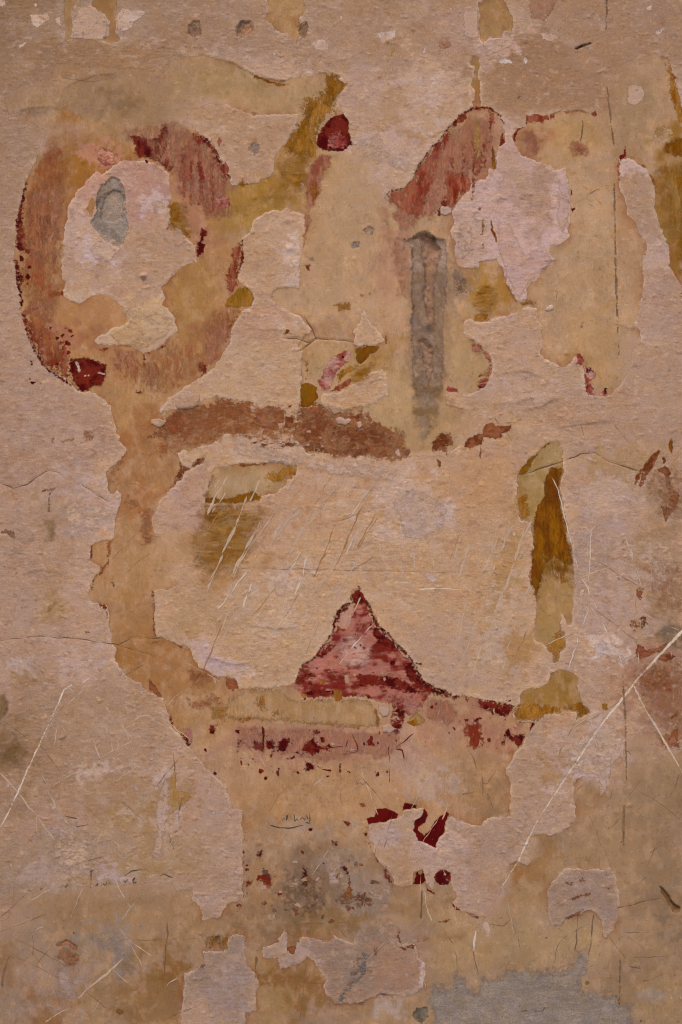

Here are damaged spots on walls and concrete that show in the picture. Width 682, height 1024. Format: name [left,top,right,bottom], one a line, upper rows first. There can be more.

spalling [87,177,128,262]
crack [286,320,349,351]
peeling [204,462,297,503]
peeling [394,480,446,538]
peeling [514,441,584,663]
peeling [299,587,395,675]
peeling [353,673,423,694]
peeling [569,726,622,792]
peeling [153,753,191,866]